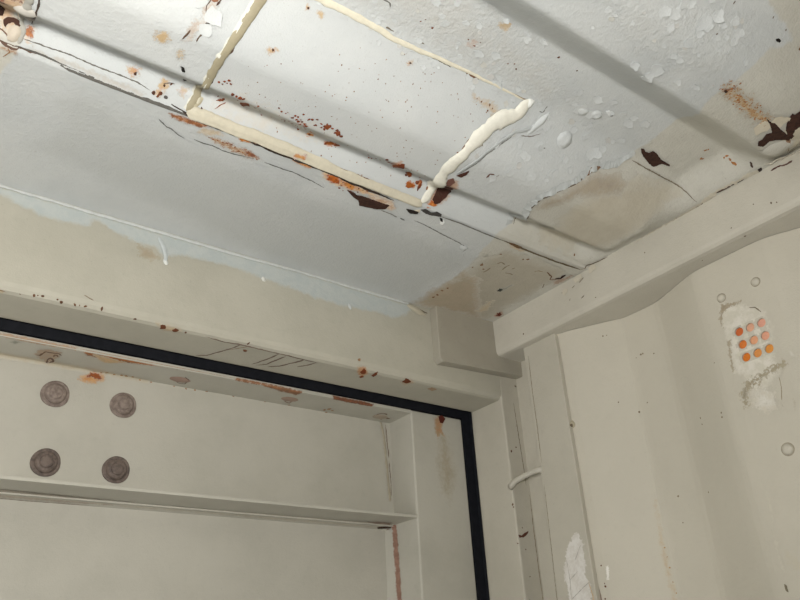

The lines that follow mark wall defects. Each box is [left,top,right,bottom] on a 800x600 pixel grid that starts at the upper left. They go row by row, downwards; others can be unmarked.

corrosion [168,113,262,161]
corrosion [205,79,352,157]
corrosion [356,156,426,191]
corrosion [713,78,800,148]
leakage [536,173,685,257]
corrosion [0,489,402,600]